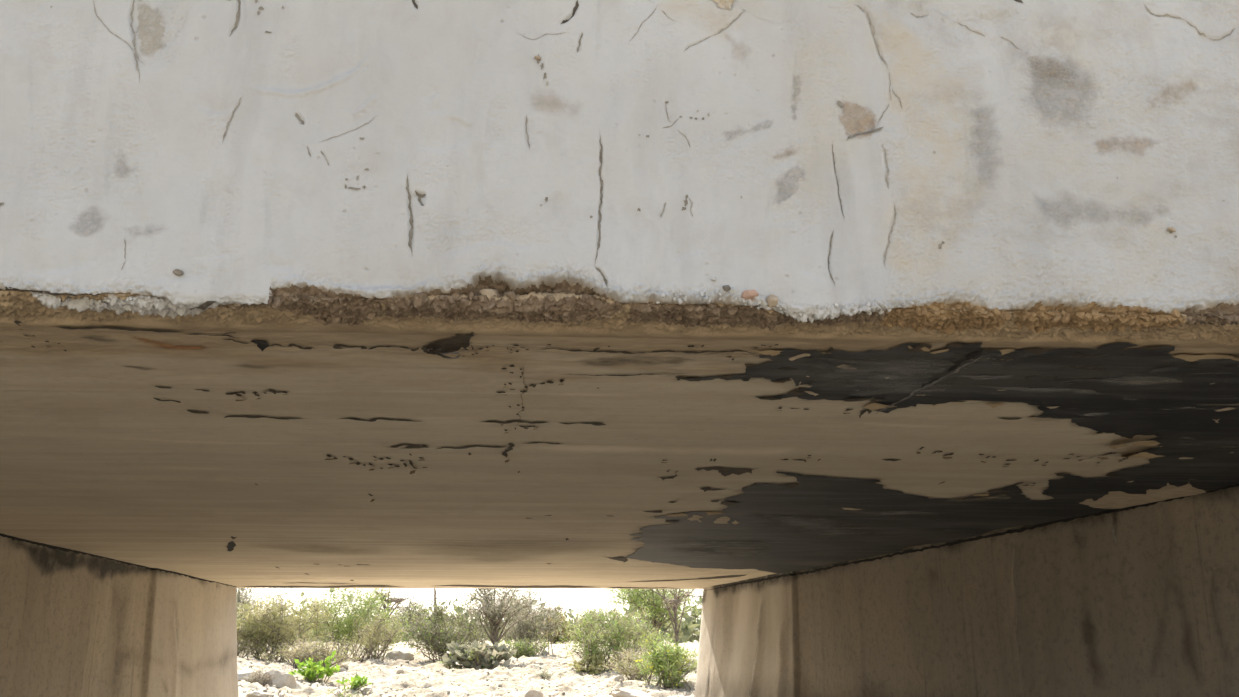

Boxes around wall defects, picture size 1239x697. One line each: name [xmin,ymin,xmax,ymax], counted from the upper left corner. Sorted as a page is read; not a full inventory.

crack [406,176,426,253]
crack [595,132,608,287]
crack [154,386,302,420]
crack [340,348,750,457]
peeling [209,275,1239,574]
crack [876,350,983,414]